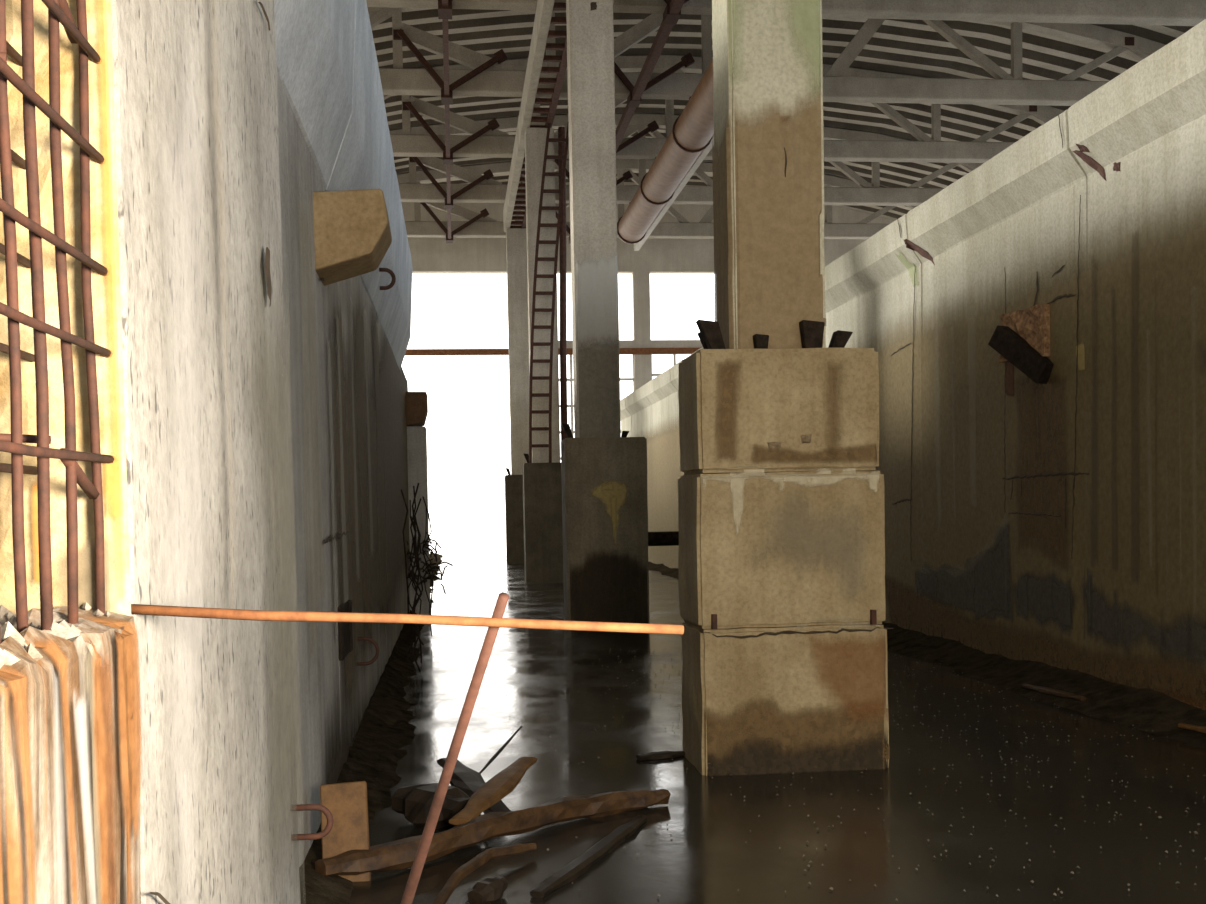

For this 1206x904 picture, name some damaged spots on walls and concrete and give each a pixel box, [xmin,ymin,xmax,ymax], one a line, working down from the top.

corrosion [0,667,47,904]
corrosion [35,641,77,904]
corrosion [87,604,684,904]
water stain [570,424,684,624]
crack [700,627,893,639]
water stain [704,702,890,776]
water stain [702,214,1206,678]